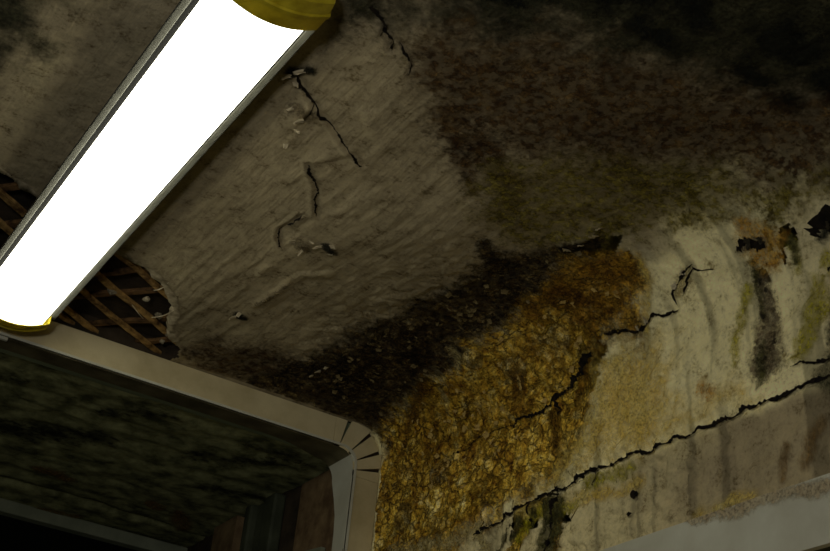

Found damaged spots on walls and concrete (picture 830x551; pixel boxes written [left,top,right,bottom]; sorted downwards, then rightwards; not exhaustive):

leakage [402,15,830,217]
spalling [0,167,39,248]
spalling [47,250,180,361]
rust [527,255,645,416]
crack [603,264,714,335]
peeling [735,237,766,253]
leakage [747,259,784,389]
peeling [804,204,830,241]
leakage [181,239,674,551]
crack [453,351,592,455]
rust [548,407,563,458]
crack [473,358,830,551]